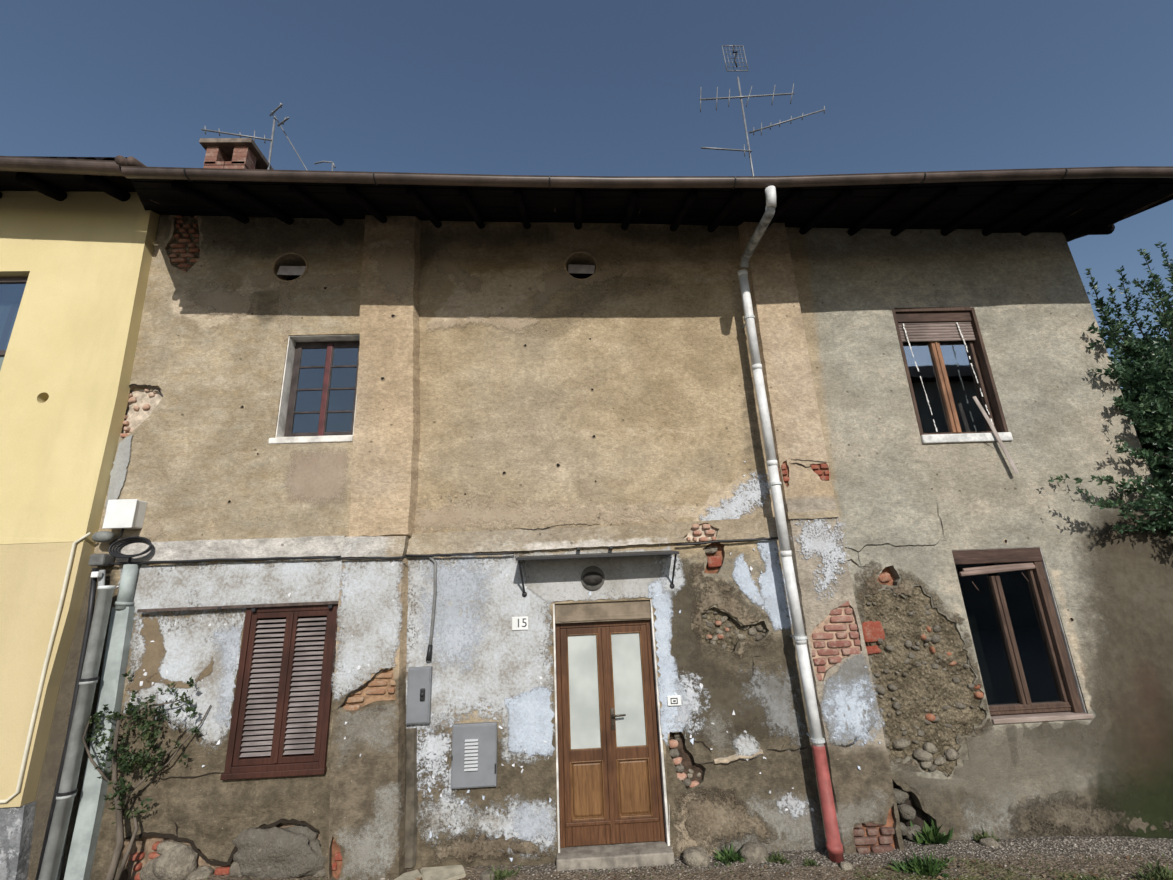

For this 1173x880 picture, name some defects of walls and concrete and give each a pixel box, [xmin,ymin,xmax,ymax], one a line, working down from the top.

spalling [166,215,200,272]
spalling [120,387,164,438]
spalling [778,461,789,487]
spalling [810,464,831,481]
crack [845,504,946,568]
peeling [123,523,814,866]
spalling [791,517,992,778]
water stain [911,510,1173,838]
spalling [853,782,931,854]
spalling [123,821,343,880]